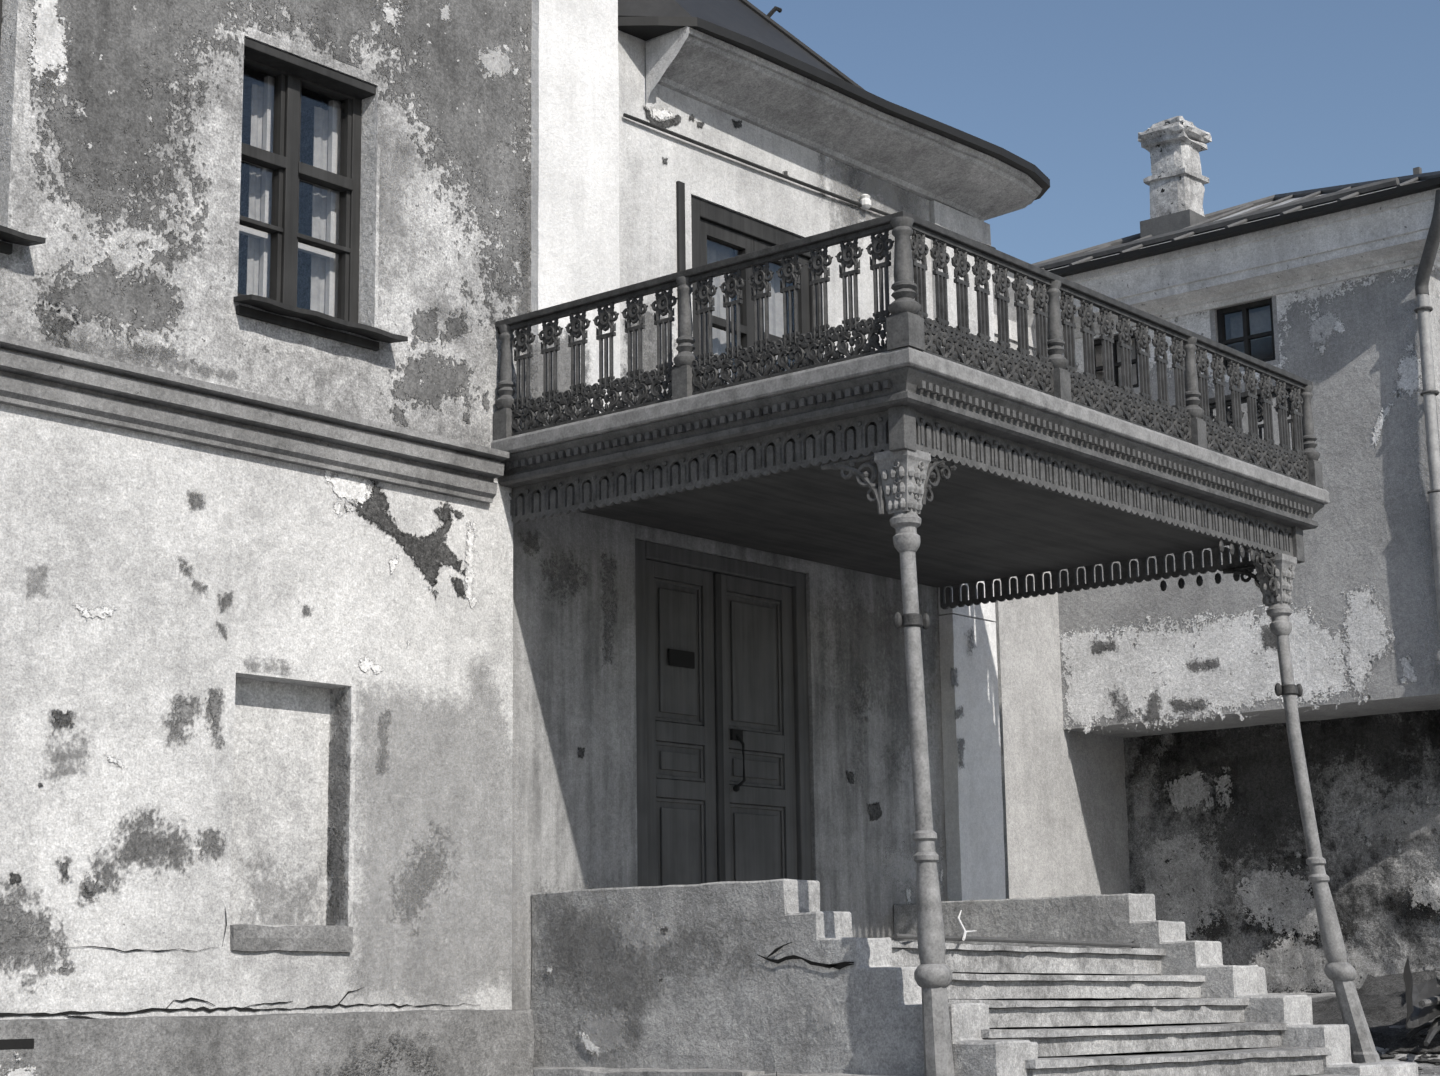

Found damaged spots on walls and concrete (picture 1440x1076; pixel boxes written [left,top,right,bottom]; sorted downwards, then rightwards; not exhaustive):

peeling [23,0,71,86]
peeling [377,0,406,46]
peeling [475,41,519,80]
peeling [1062,265,1437,393]
peeling [1370,343,1423,447]
flaking render [324,470,478,610]
spalling [180,561,233,639]
peeling [1059,584,1417,737]
spalling [52,709,74,729]
spalling [9,872,22,886]
crack [757,942,854,970]
crack [0,988,476,1019]